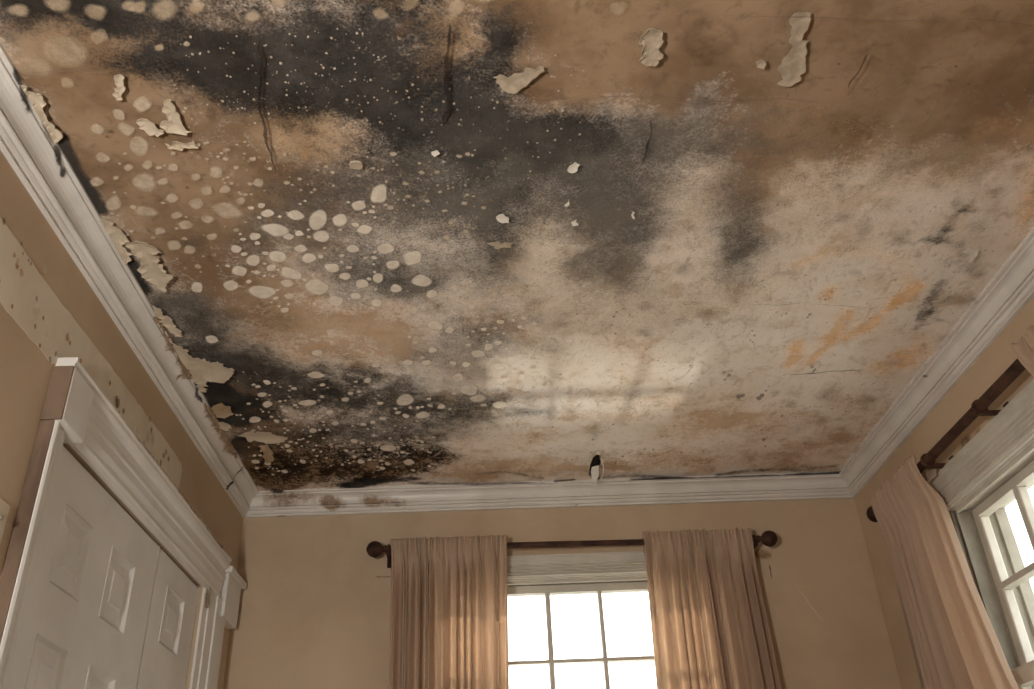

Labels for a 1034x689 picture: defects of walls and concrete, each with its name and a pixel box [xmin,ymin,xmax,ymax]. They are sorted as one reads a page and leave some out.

crack [258,38,277,173]
flaking render [493,66,545,94]
flaking render [638,28,664,66]
flaking render [756,12,811,87]
leakage [0,0,1034,510]
peeling [0,217,182,488]
peeling [152,305,235,392]
spalling [589,455,601,476]